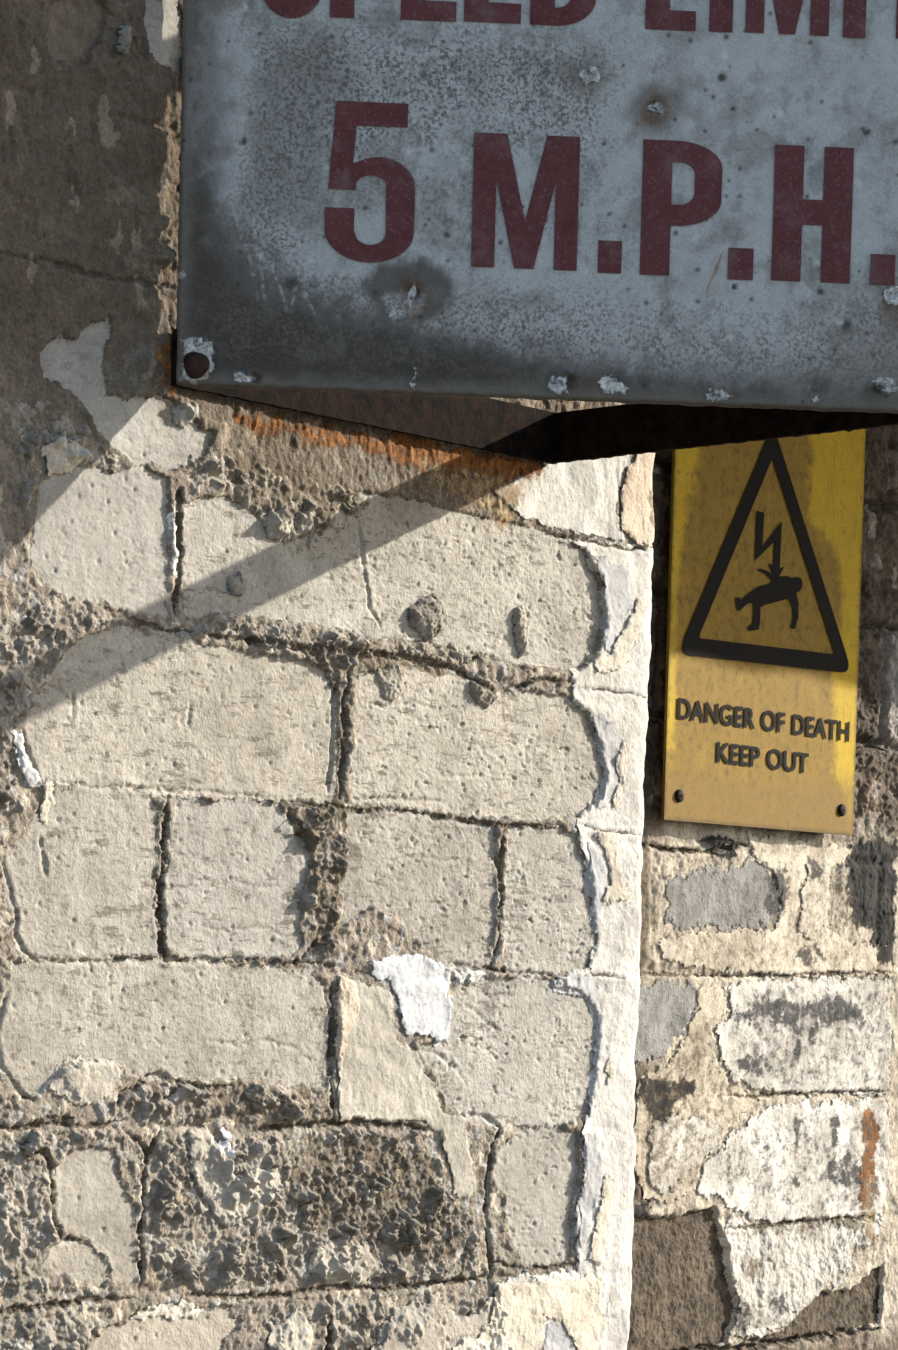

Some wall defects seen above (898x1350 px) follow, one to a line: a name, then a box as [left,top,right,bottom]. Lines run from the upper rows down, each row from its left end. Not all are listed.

flaking render [105,173,177,281]
peeling [0,317,895,1350]
crack [102,486,893,980]
crack [0,1076,236,1315]